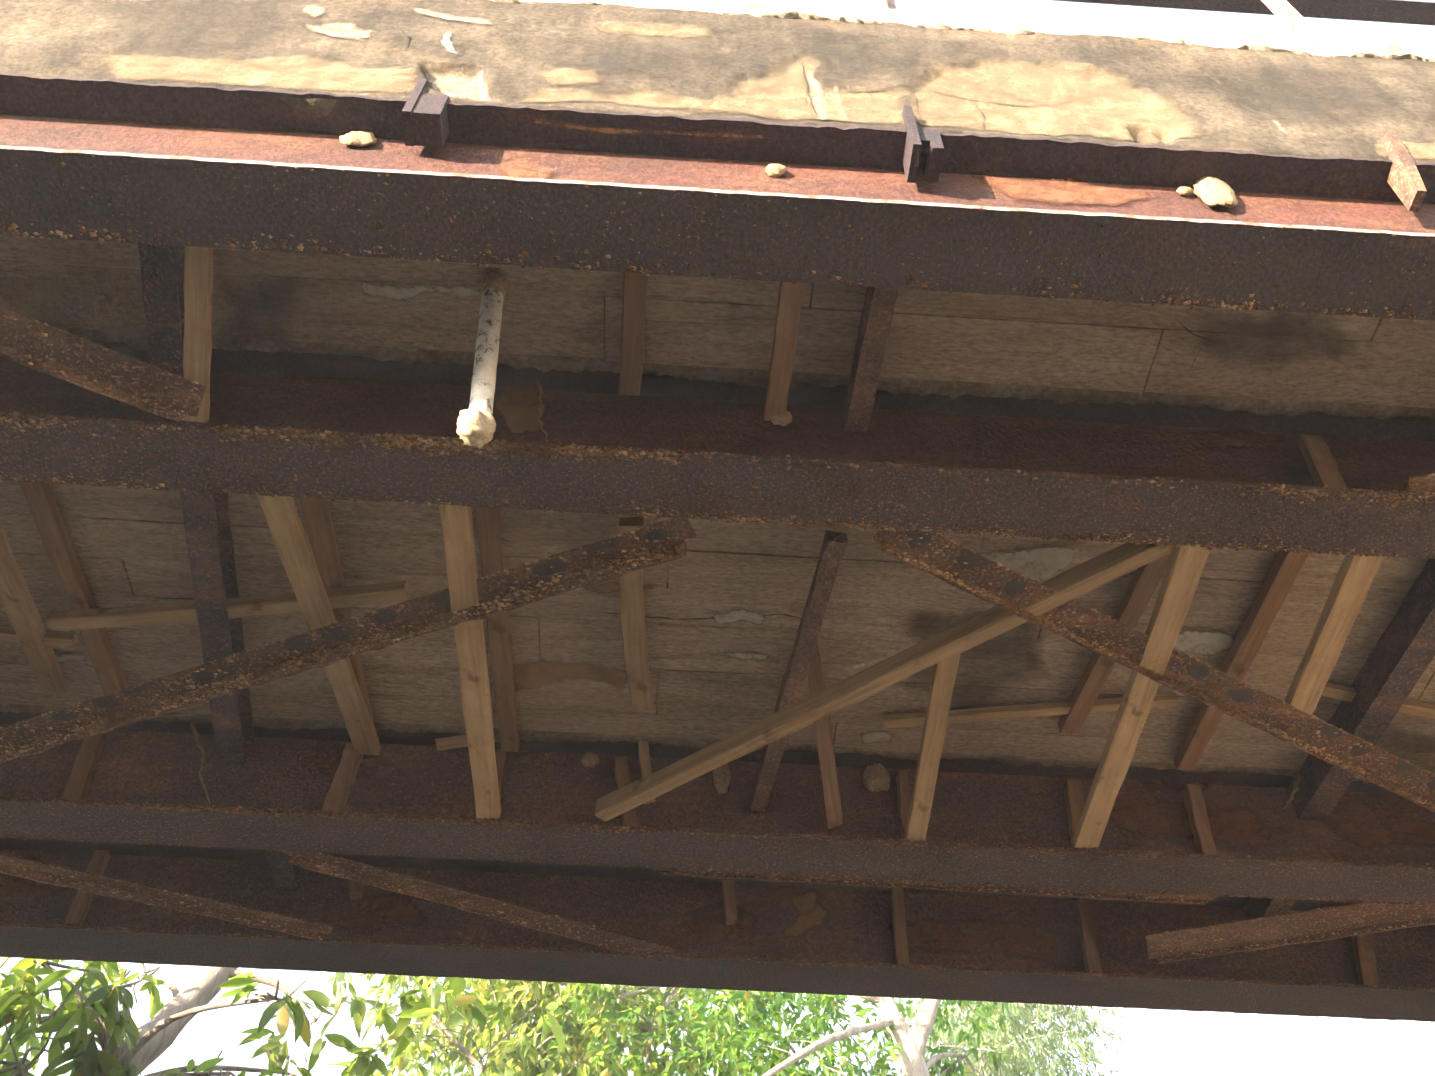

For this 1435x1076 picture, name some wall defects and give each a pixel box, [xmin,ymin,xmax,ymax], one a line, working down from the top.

spalling [915,63,1190,144]
corrosion [0,153,1435,322]
corrosion [0,319,893,475]
corrosion [909,465,1435,512]
corrosion [0,503,1435,809]
water stain [960,621,1039,690]
corrosion [0,854,326,940]